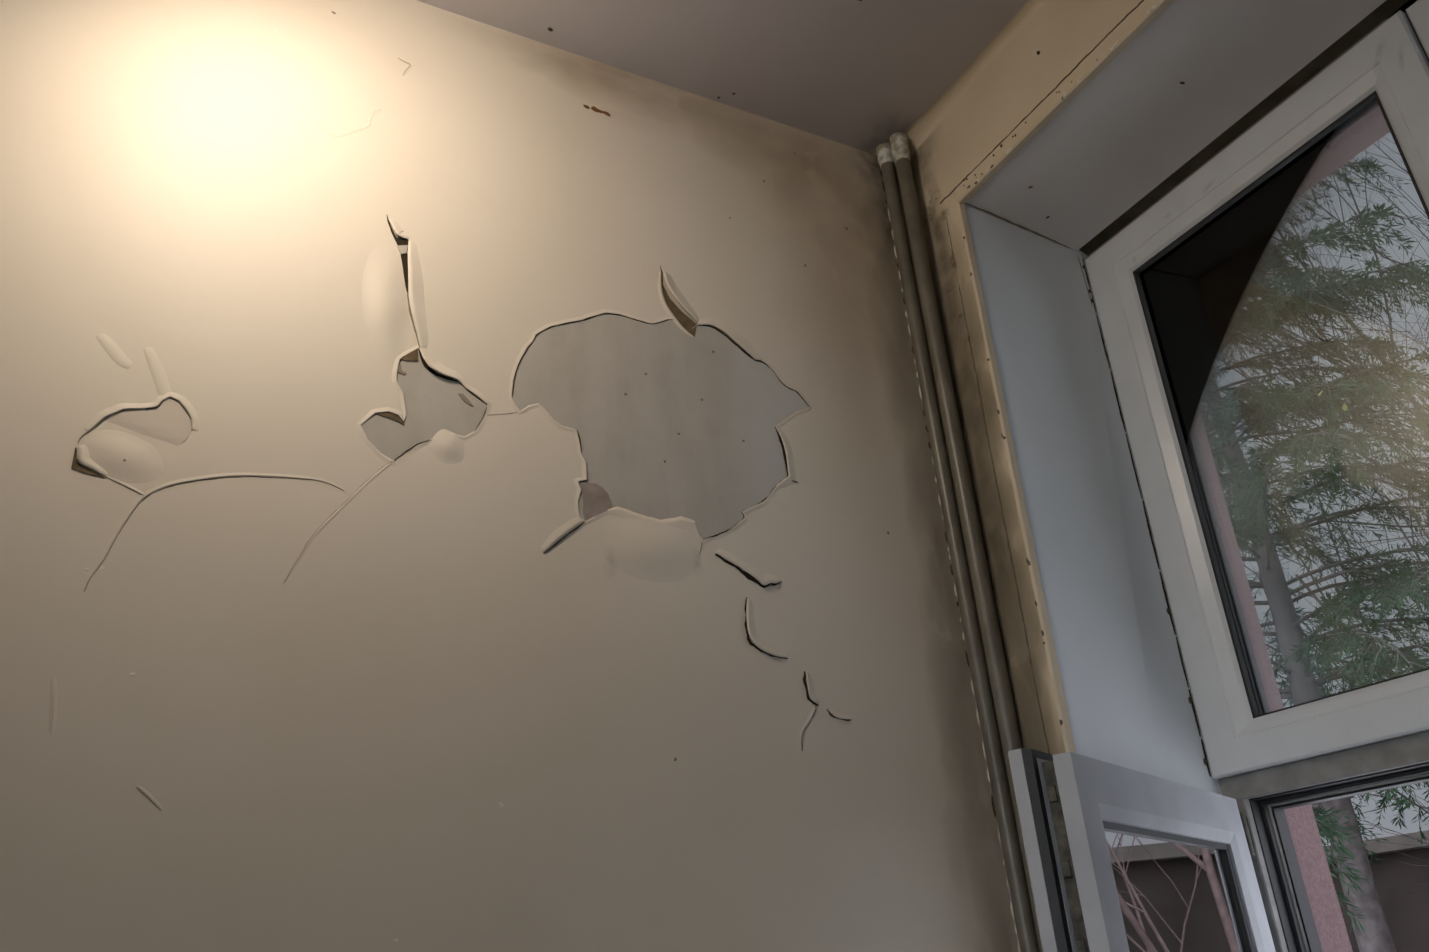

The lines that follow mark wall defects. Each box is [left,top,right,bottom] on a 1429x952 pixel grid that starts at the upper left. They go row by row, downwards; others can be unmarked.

peeling [356,265,812,583]
crack [699,543,852,751]